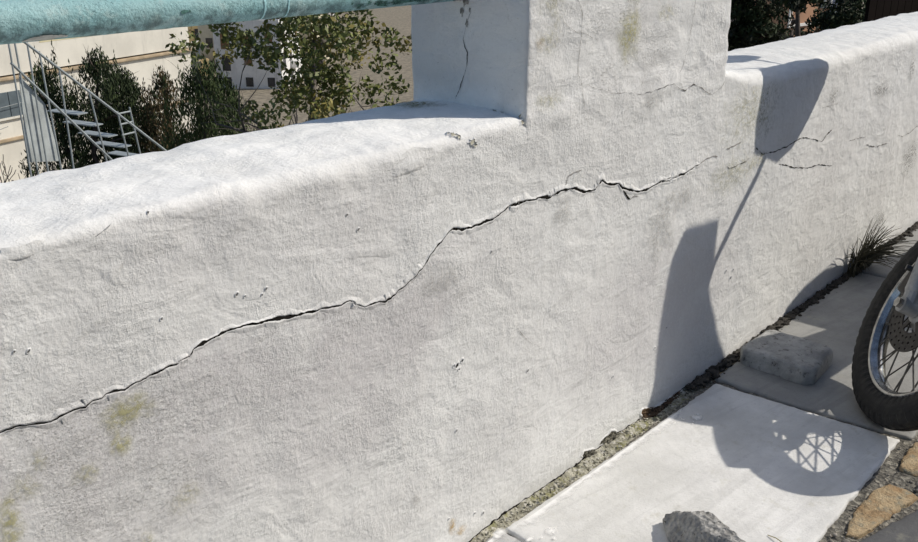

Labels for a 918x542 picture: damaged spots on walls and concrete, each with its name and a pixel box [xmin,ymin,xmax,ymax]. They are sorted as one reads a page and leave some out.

crack [563,1,724,106]
crack [0,126,917,440]